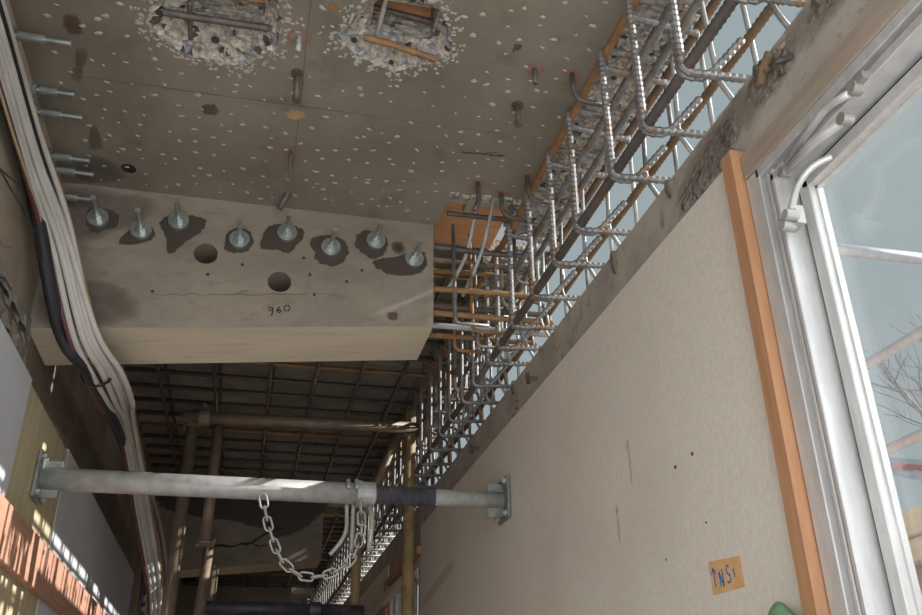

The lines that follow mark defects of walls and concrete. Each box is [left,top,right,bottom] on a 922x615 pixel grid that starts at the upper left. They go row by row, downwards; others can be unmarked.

spalling [79,14,109,35]
spalling [110,0,305,93]